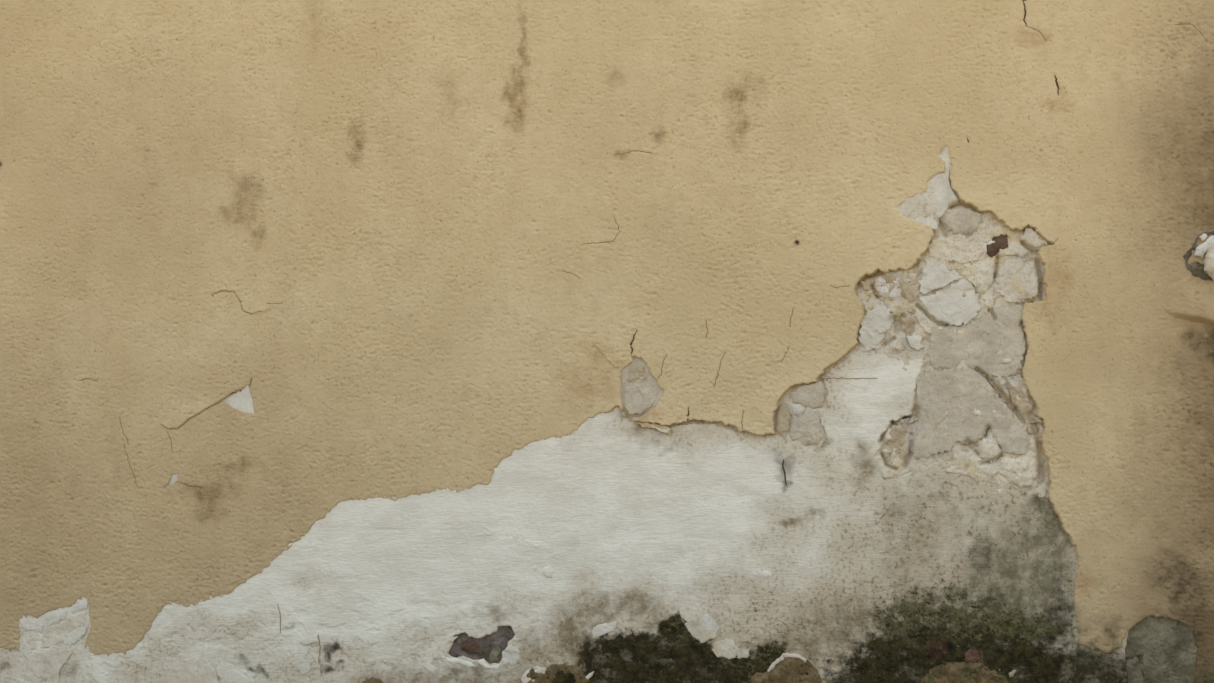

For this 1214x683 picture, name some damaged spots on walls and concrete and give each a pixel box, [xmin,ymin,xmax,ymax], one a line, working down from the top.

spalling [1184,231,1214,281]
peeling [0,146,1198,683]
leakage [558,594,647,665]